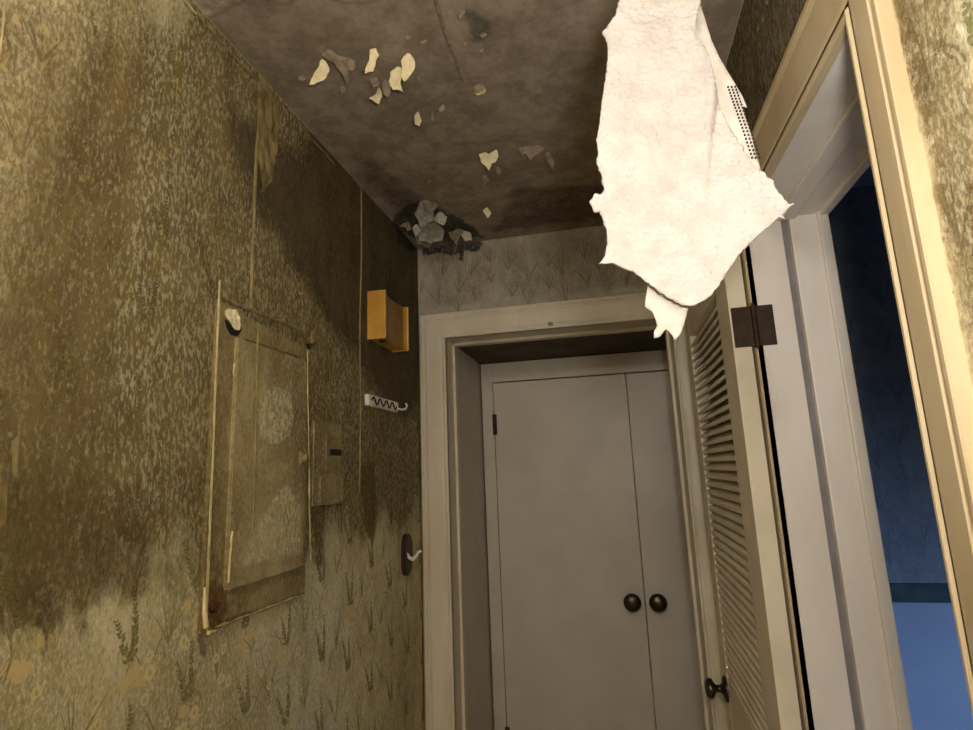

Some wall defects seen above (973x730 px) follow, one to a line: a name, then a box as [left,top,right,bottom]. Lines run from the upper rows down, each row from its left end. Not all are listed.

peeling [298,48,425,104]
damp [700,0,806,133]
peeling [414,105,446,126]
peeling [479,149,501,185]
peeling [519,144,554,169]
damp [894,0,973,333]
peeling [398,200,472,252]
damp [0,0,619,631]